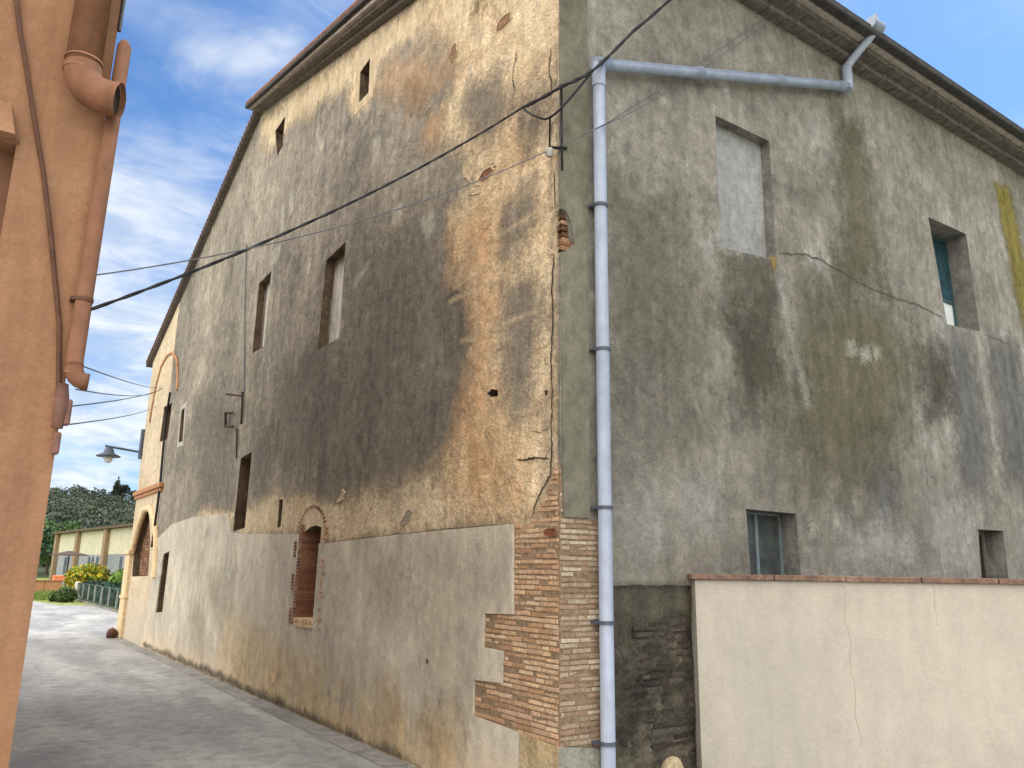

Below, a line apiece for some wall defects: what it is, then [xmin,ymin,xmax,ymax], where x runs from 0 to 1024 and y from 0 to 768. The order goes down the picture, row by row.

water stain [282,222,462,482]
peeling [198,0,573,543]
water stain [504,281,542,416]
water stain [722,253,782,413]
crack [780,252,944,319]
water stain [925,332,983,483]
water stain [994,348,1024,477]